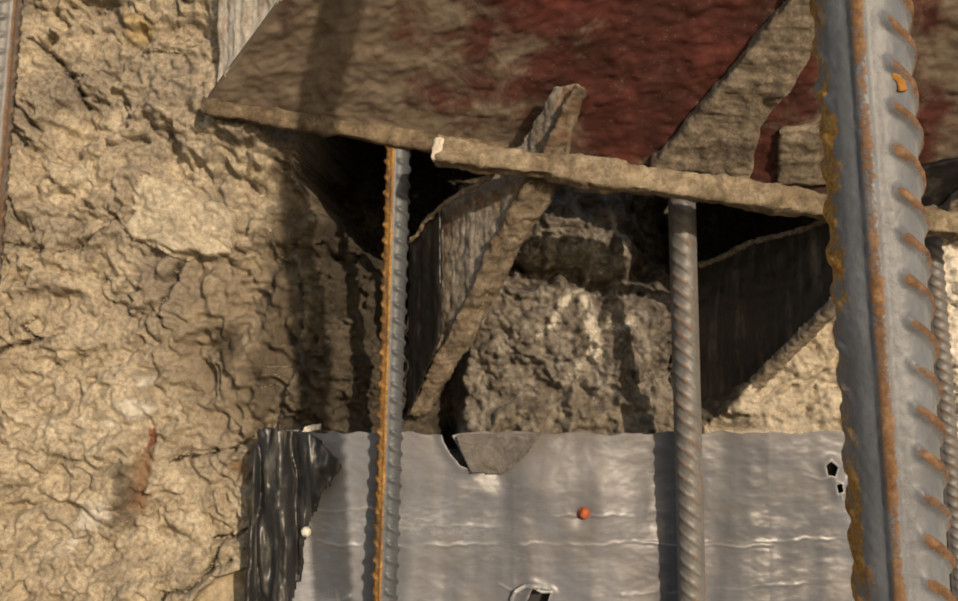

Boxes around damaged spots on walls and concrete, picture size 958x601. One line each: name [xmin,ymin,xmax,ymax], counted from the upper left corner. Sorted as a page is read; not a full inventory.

corrosion [129,428,156,511]
spalling [279,0,958,601]